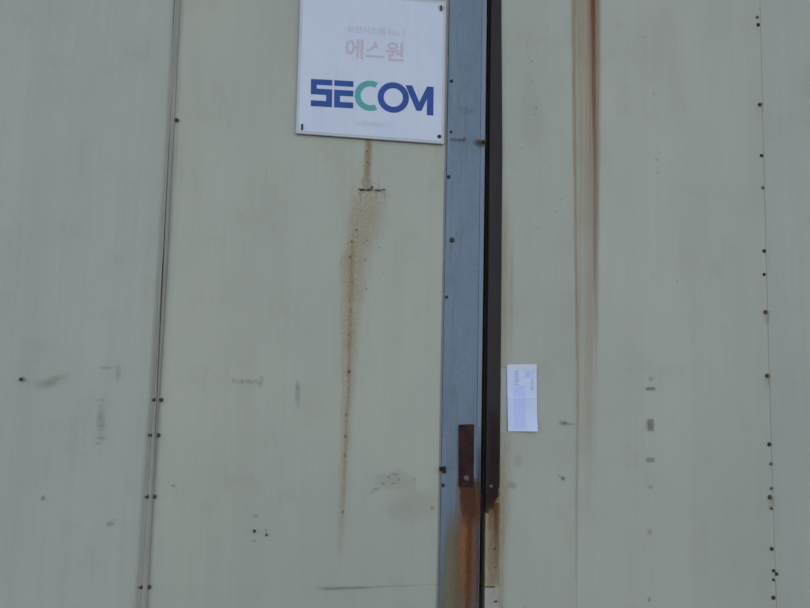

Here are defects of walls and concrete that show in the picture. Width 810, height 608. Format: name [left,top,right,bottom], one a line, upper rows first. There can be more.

corrosion [444,419,499,608]